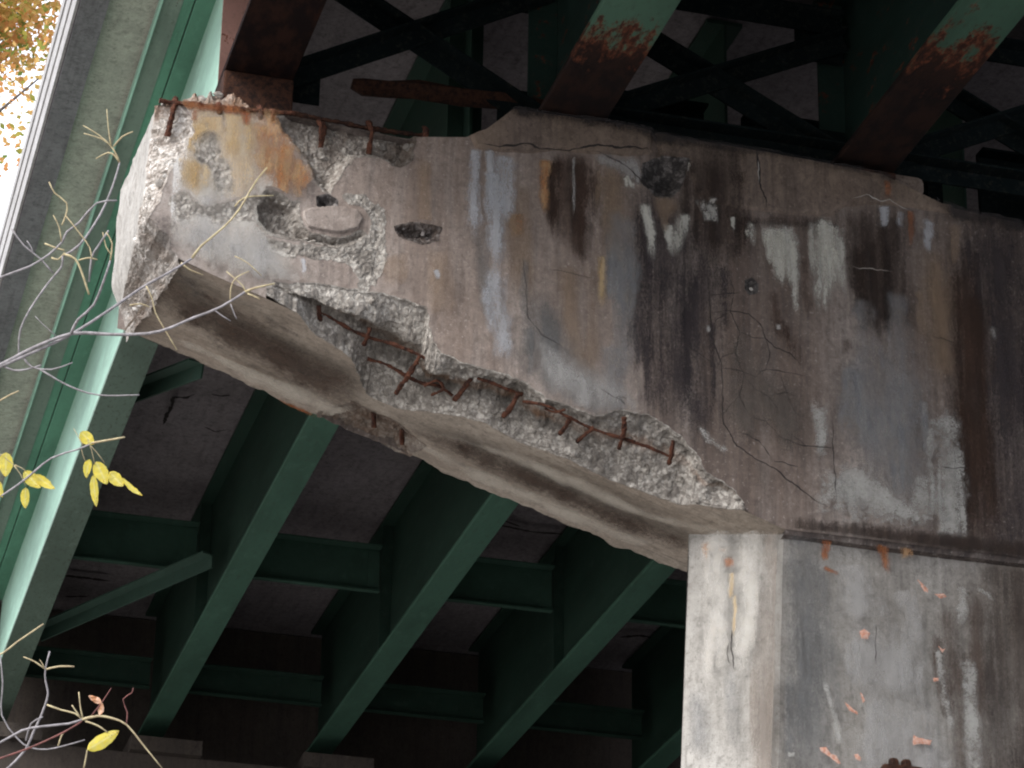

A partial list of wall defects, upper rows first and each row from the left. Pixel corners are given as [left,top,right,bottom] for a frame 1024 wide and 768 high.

corrosion [180,102,310,193]
spalling [120,91,745,511]
efflorescence [466,150,513,258]
efflorescence [483,272,511,353]
crack [485,143,653,190]
crack [675,268,836,507]
water stain [627,147,905,450]
water stain [795,221,1024,555]
water stain [705,538,774,768]
water stain [933,567,1024,768]